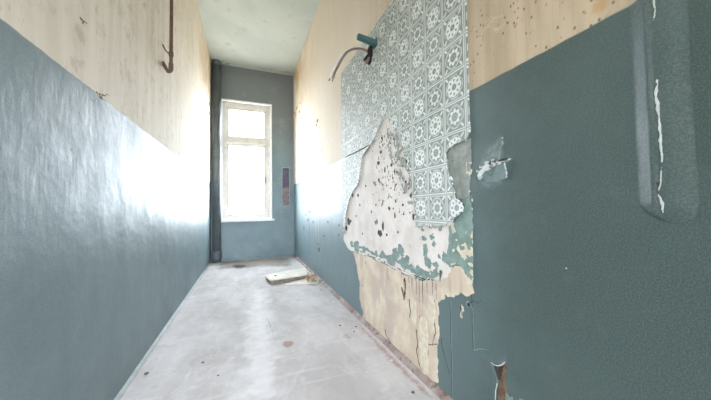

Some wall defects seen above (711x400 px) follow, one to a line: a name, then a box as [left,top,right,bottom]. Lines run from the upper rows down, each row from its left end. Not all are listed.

spalling [466,132,514,194]
peeling [338,117,474,383]
spalling [475,318,523,400]